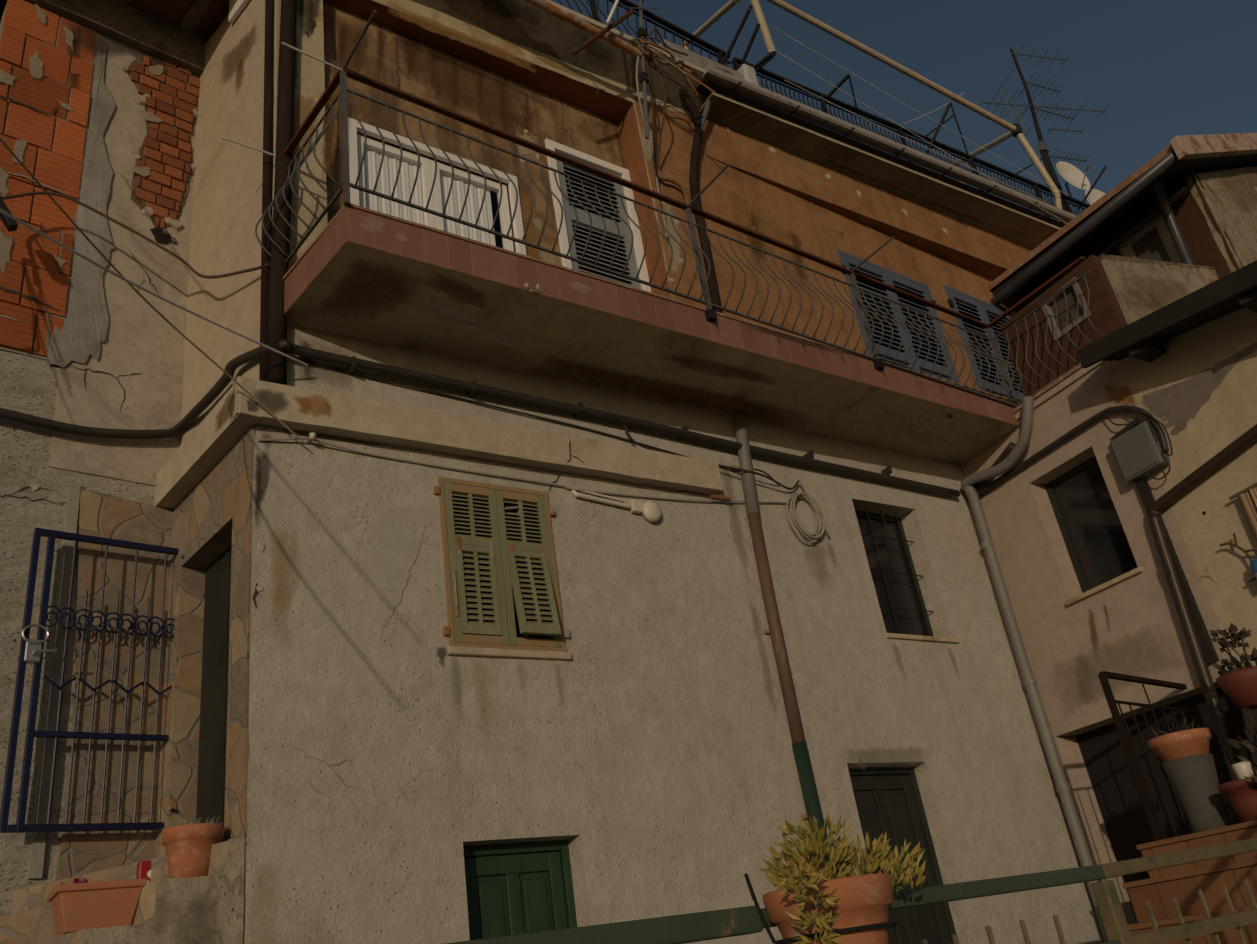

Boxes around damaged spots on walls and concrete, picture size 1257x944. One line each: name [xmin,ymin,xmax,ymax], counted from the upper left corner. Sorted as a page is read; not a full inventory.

spalling [142,207,184,244]
crack [0,486,67,504]